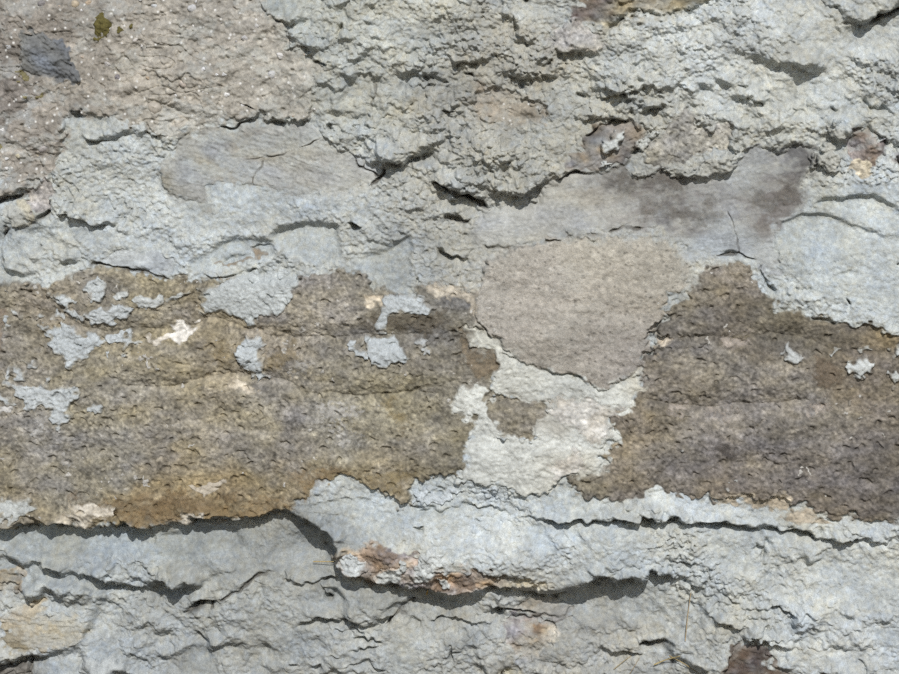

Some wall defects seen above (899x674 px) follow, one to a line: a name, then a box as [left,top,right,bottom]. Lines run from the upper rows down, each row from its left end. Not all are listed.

peeling [112,284,130,301]
peeling [36,308,66,321]
peeling [344,339,368,361]
spalling [459,328,499,378]
peeling [13,359,38,382]
peeling [886,371,899,391]
peeling [87,403,103,414]
peeling [188,479,227,497]